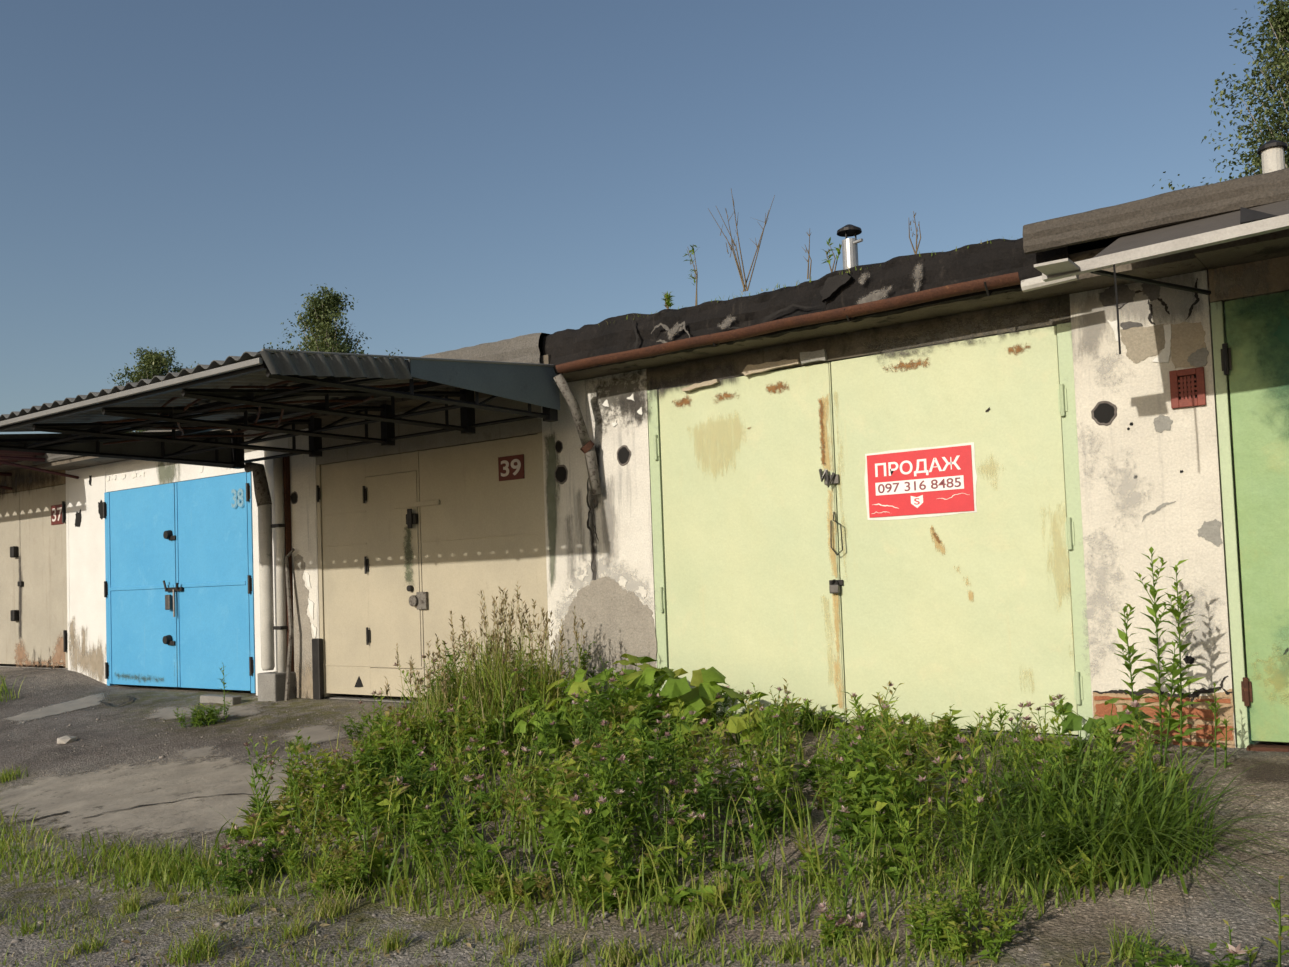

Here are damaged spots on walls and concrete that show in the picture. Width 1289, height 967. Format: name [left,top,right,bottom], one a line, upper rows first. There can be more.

flaking render [1085,276,1200,363]
peeling [591,369,649,433]
corrosion [767,382,788,394]
corrosion [887,359,929,372]
corrosion [819,397,830,470]
corrosion [827,489,837,577]
corrosion [930,526,955,567]
flaking render [1093,689,1235,748]